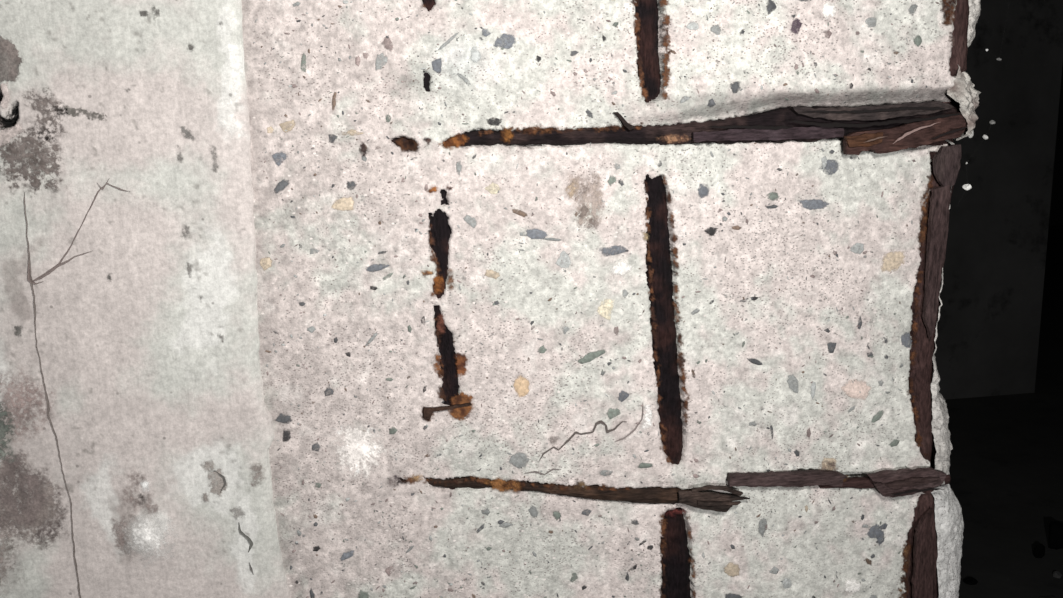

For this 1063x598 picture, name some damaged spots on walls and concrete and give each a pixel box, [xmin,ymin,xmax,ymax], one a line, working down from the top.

rust [396,133,467,152]
rust [480,112,643,142]
spalling [241,0,981,598]
water stain [0,382,66,582]
crack [24,181,130,598]
rust [422,314,473,421]
crack [524,405,652,475]